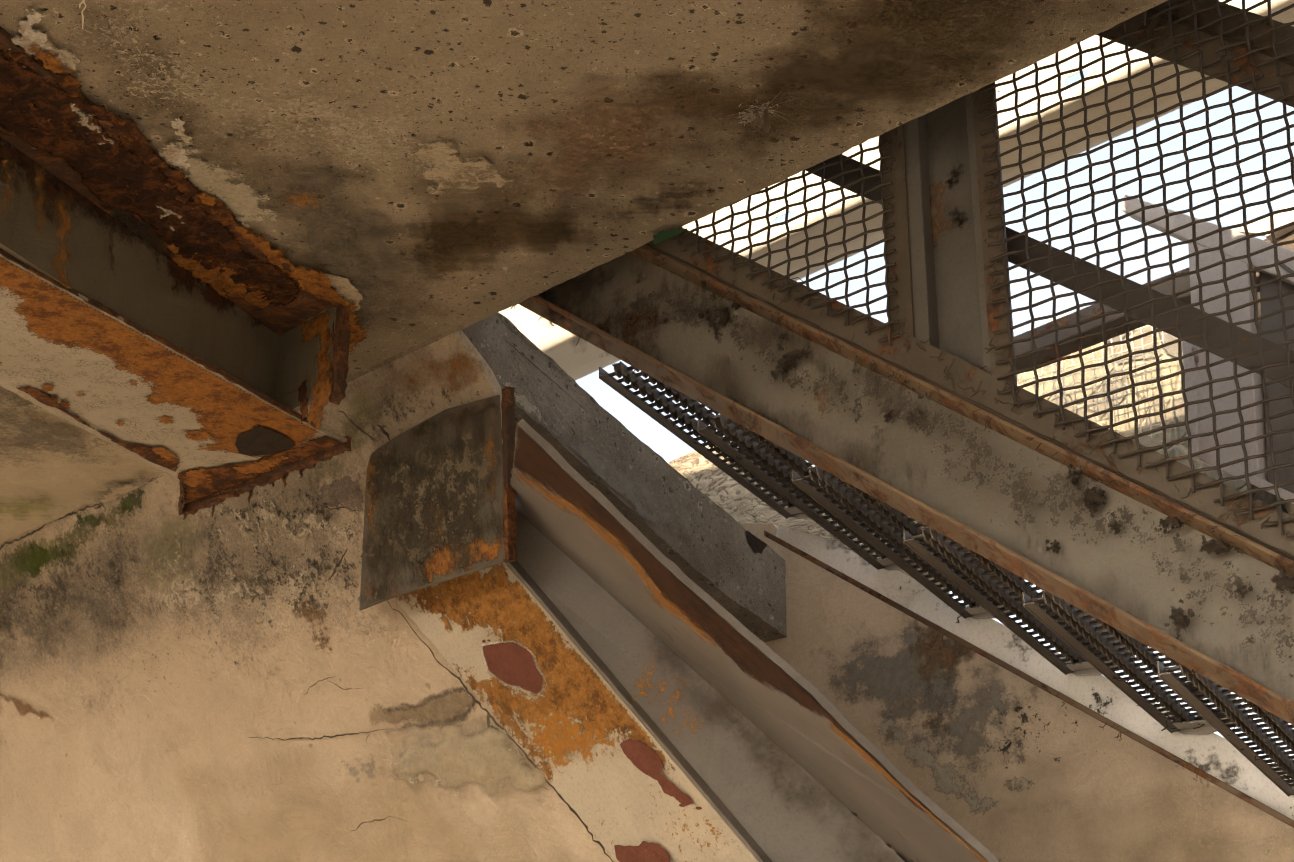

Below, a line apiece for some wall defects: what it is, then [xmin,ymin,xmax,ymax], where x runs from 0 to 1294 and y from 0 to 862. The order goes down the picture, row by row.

damp [529,0,1025,191]
rust [0,43,368,516]
mould [181,478,362,674]
crack [249,728,388,741]
crack [306,676,361,694]
crack [387,601,614,862]
peeling [482,639,543,694]
rust [395,528,742,862]
peeling [614,841,670,862]
peeling [620,739,702,810]
rust [513,427,987,862]
damp [828,628,1078,812]